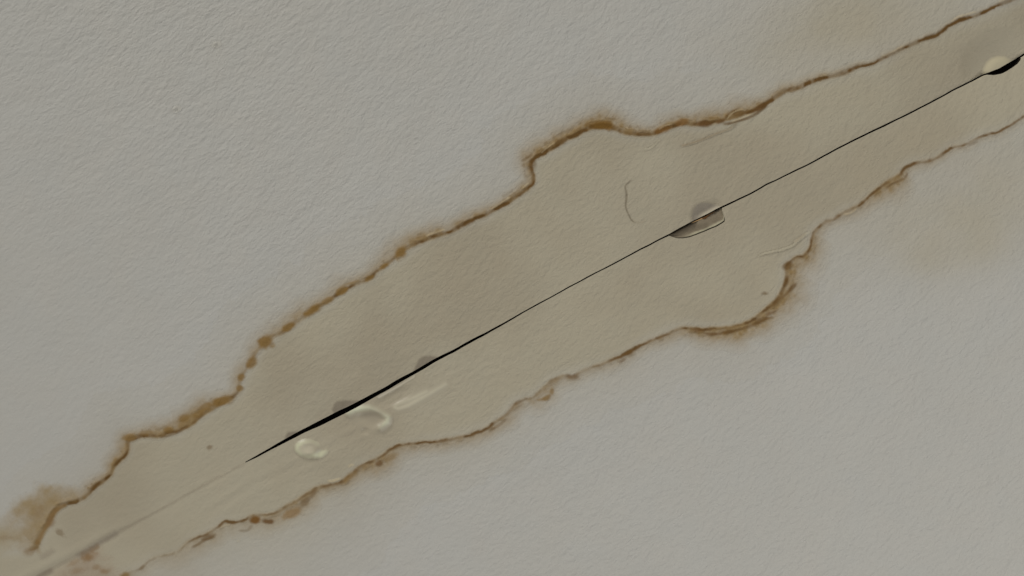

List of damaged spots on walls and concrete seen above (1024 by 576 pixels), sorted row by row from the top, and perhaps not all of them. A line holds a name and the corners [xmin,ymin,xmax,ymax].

crack [35,179,669,576]
leakage [66,14,959,508]
crack [691,54,1024,237]
leakage [738,0,1020,123]